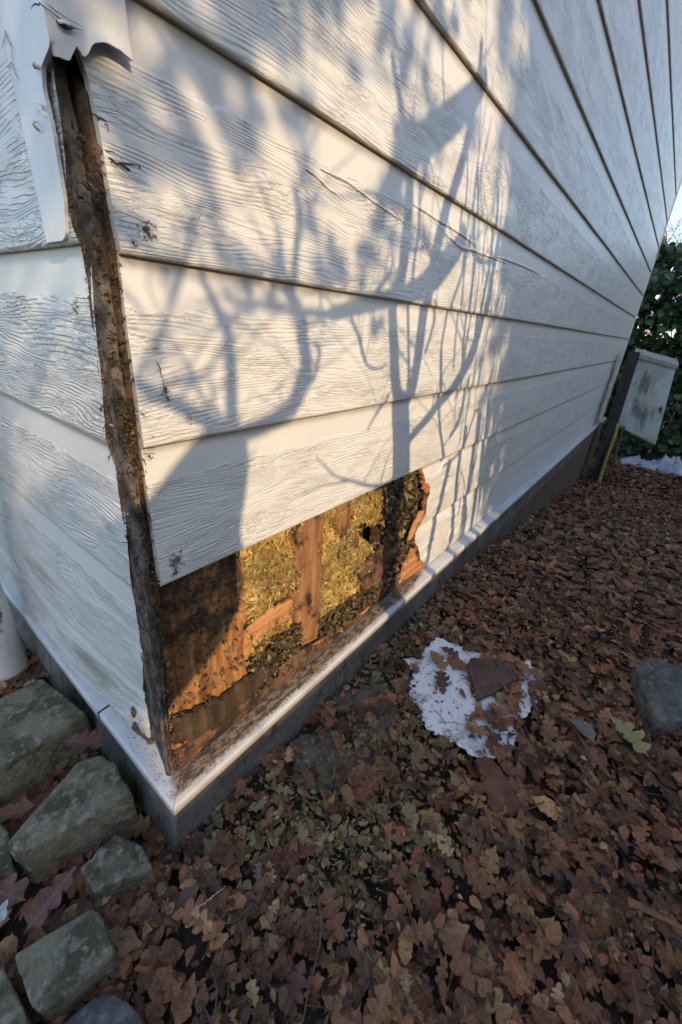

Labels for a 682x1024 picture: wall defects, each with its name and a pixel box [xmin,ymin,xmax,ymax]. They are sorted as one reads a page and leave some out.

crack [306,169,539,274]
spalling [60,78,340,776]
spalling [331,500,352,541]
spalling [357,468,430,615]